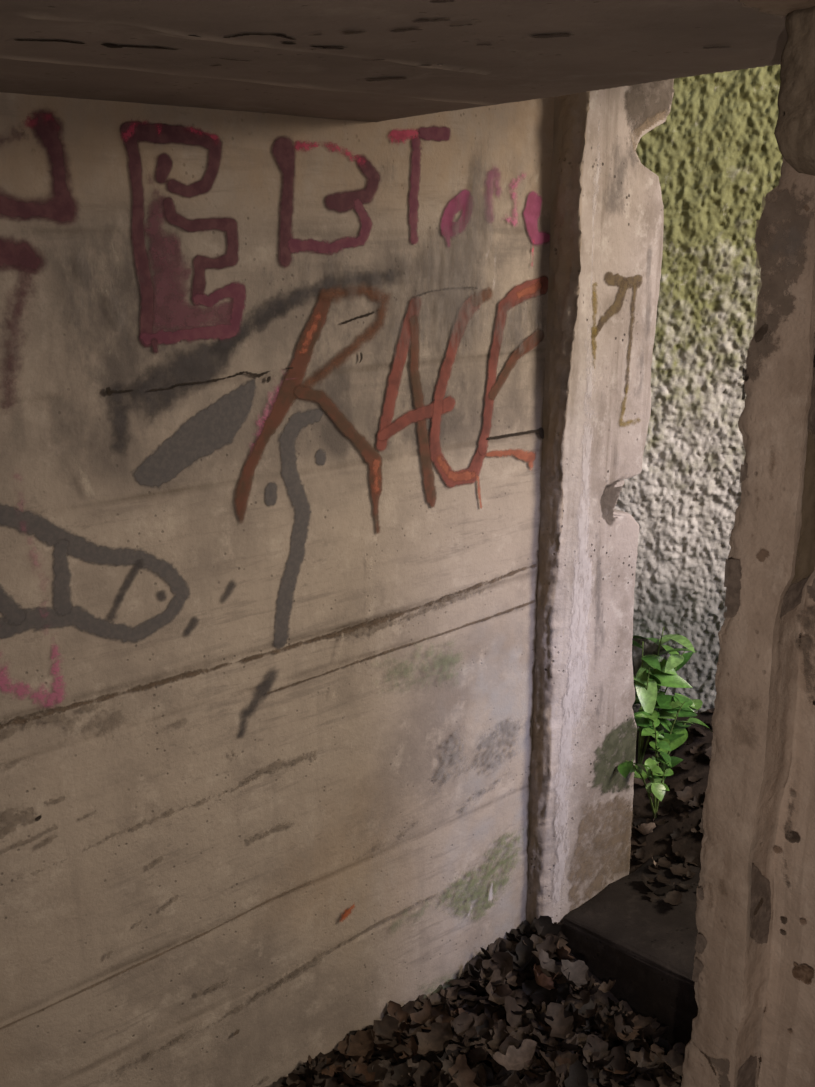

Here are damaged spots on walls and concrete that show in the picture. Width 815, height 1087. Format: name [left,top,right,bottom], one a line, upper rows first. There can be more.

spalling [742,6,815,400]
spalling [740,460,748,483]
spalling [723,559,742,618]
spalling [780,576,815,705]
spalling [700,1051,757,1087]